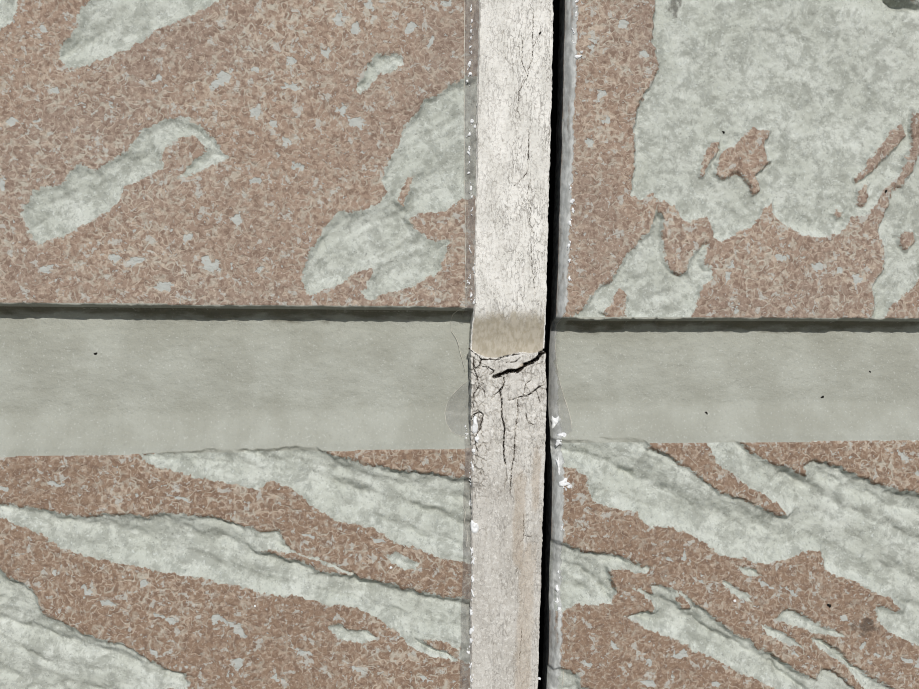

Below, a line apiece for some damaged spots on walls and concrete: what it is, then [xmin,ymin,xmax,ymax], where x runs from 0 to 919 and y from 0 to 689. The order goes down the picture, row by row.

spalling [0,0,18,30]
spalling [59,0,219,71]
spalling [20,116,229,245]
spalling [301,4,477,301]
spalling [569,0,919,318]
crack [468,348,546,493]
spalling [0,416,479,689]
spalling [549,525,894,689]
spalling [550,416,919,647]